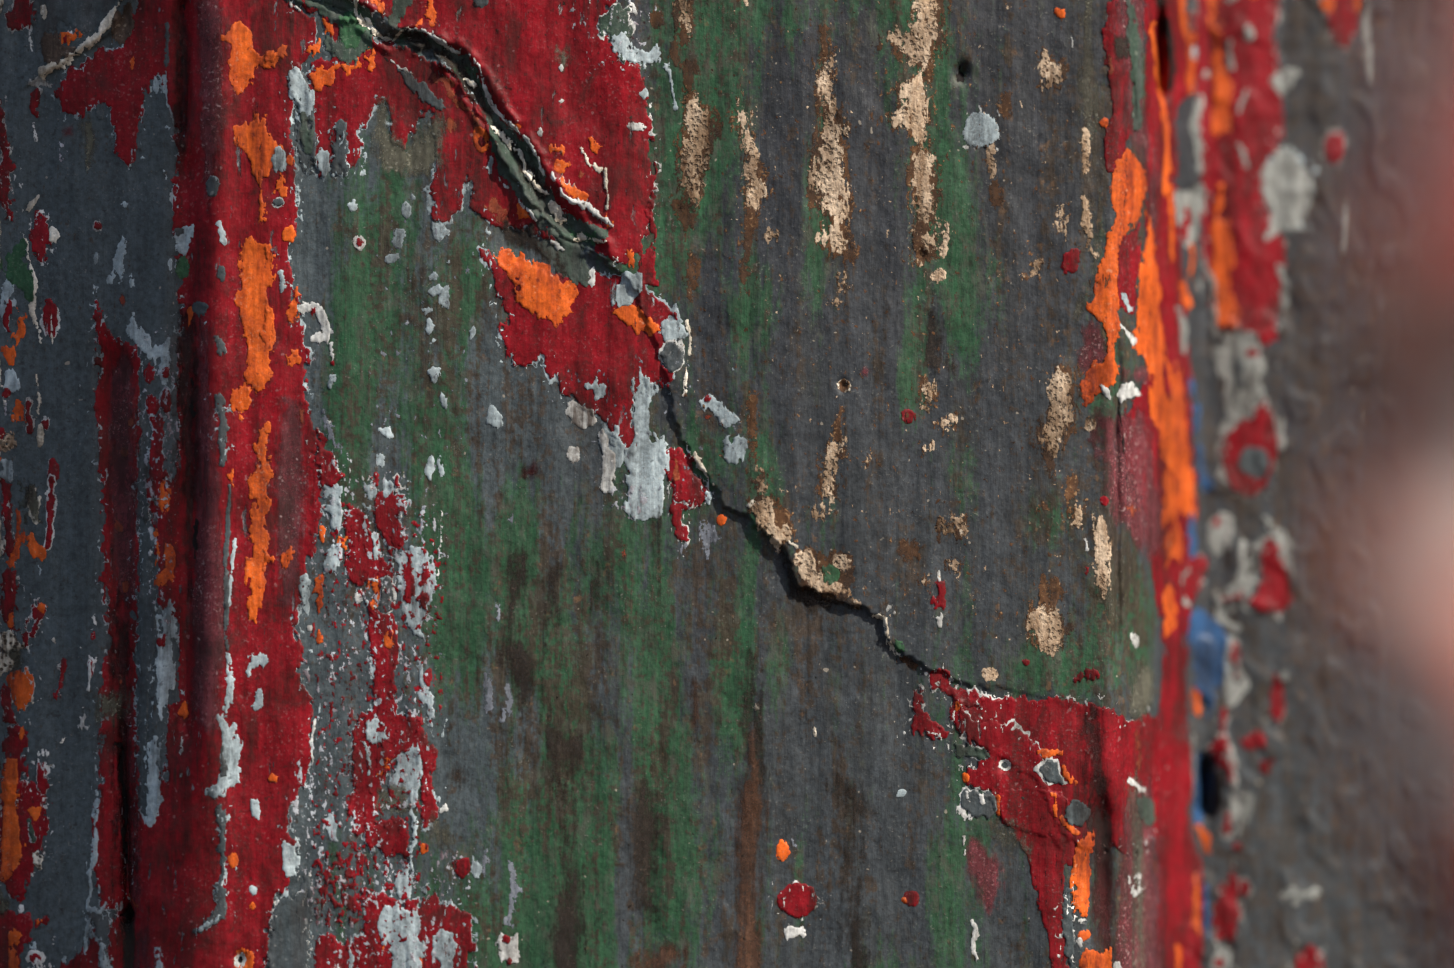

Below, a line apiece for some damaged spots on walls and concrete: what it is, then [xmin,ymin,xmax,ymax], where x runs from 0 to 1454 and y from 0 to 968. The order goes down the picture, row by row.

crack [286,0,614,287]
peeling [1316,0,1375,84]
peeling [1382,0,1454,273]
crack [191,518,199,559]
peeling [0,0,748,968]
spalling [745,492,907,657]
peeling [897,0,1348,968]